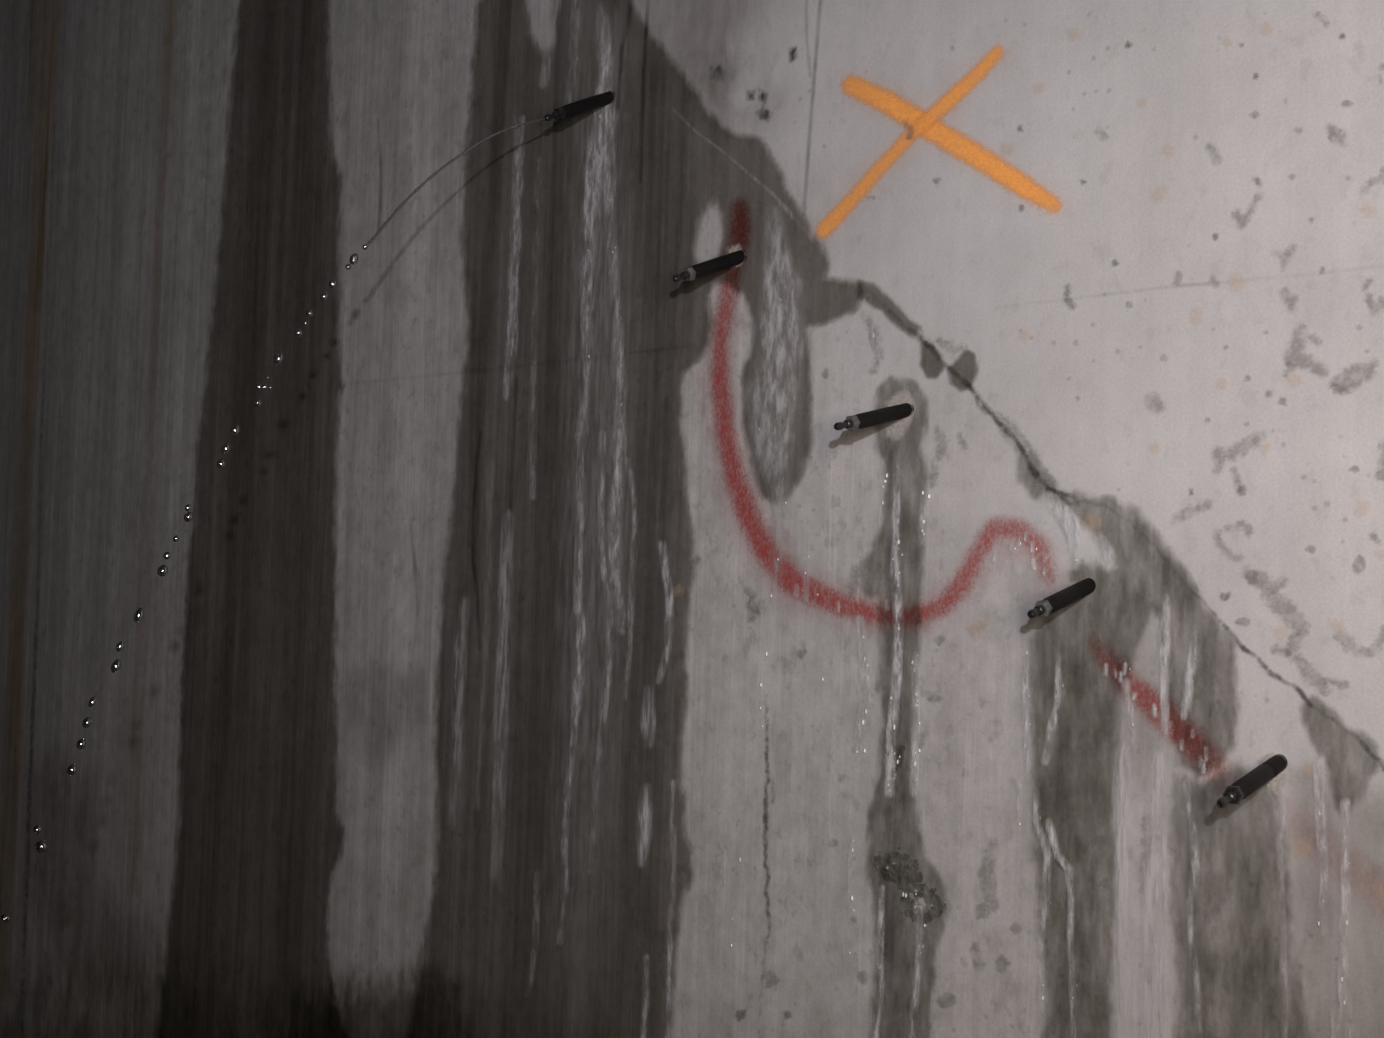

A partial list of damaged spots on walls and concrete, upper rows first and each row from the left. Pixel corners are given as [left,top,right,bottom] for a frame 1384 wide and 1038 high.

damp [584,33,611,291]
damp [757,223,797,481]
damp [601,431,623,514]
crack [966,381,1063,493]
damp [574,586,585,725]
damp [882,466,921,796]
damp [1155,621,1174,731]
damp [1184,657,1196,715]
crack [1241,645,1312,706]
damp [640,797,649,857]
damp [1034,802,1071,880]
damp [1117,751,1128,953]